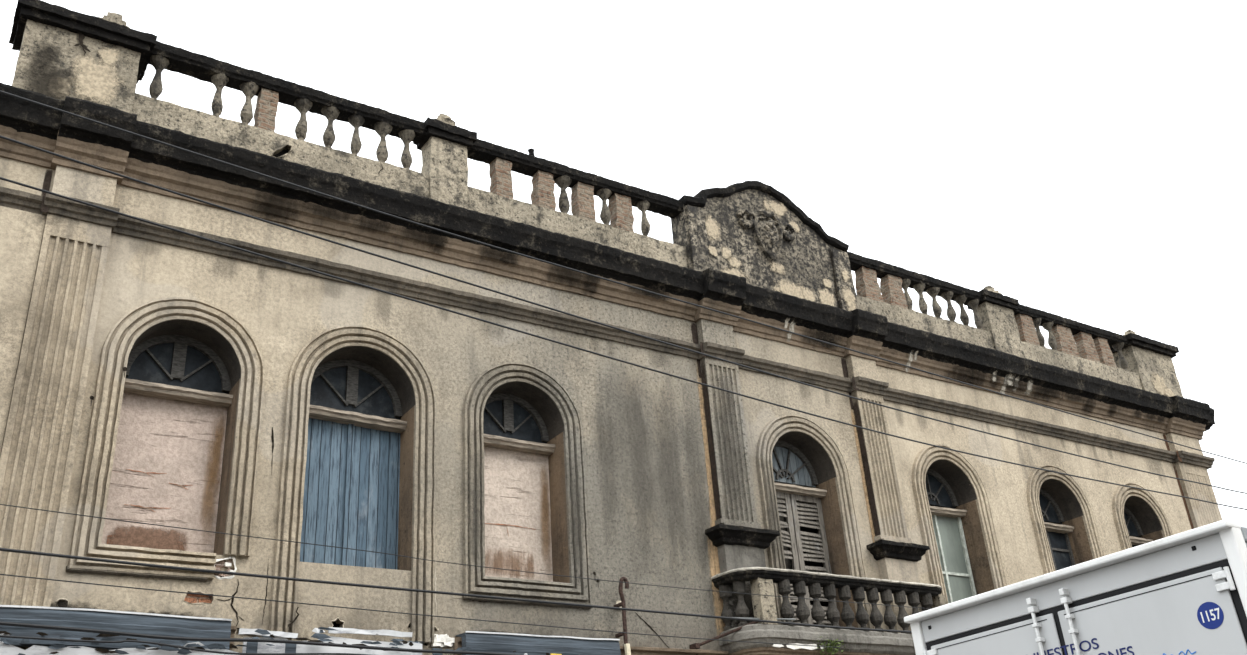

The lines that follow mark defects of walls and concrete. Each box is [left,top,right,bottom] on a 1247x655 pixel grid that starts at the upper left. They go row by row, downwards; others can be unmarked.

damp [25,43,70,100]
damp [41,170,52,213]
damp [258,192,293,220]
damp [313,204,391,232]
flaking render [764,200,800,232]
flaking render [705,216,745,277]
flaking render [771,262,856,311]
damp [949,365,1095,413]
damp [691,323,721,520]
spalling [182,556,237,605]
crack [218,569,299,632]